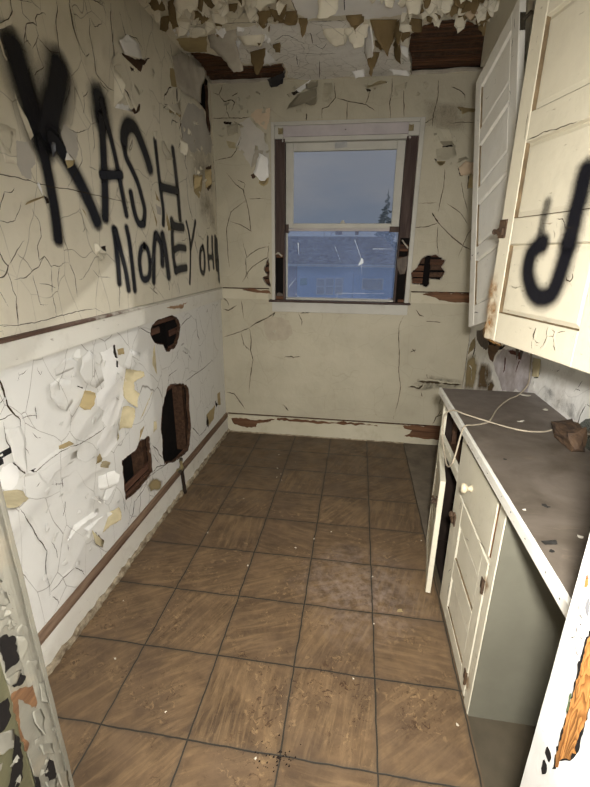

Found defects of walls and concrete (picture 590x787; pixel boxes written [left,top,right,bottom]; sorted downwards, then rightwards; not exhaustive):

peeling [111,0,500,198]
crack [163,87,191,212]
crack [416,171,479,256]
spalling [404,254,469,303]
spalling [150,302,189,373]
crack [393,310,442,418]
flaking render [468,327,541,396]
peeling [0,345,191,551]
peeling [231,418,377,428]
peeling [403,425,441,440]
peeling [0,579,71,787]